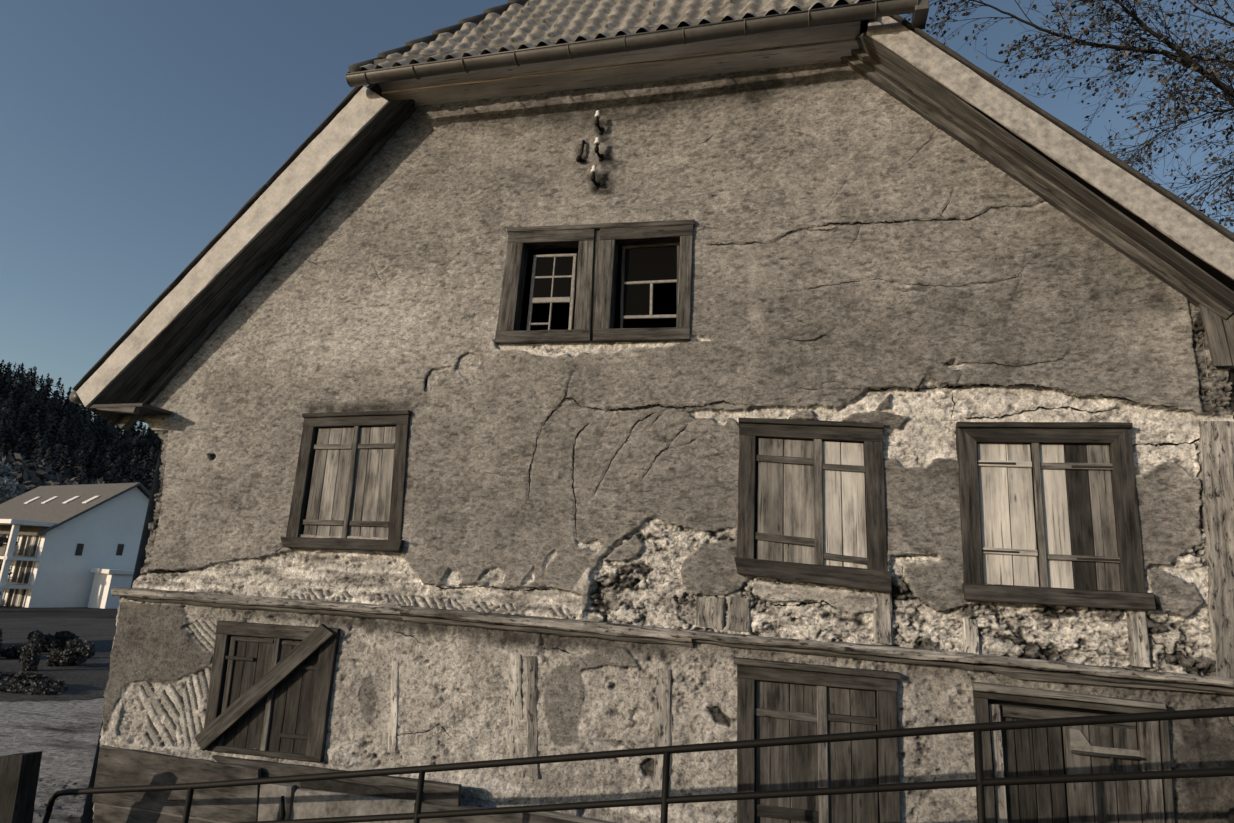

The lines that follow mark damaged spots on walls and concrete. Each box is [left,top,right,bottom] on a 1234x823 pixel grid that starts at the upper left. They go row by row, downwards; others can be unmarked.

crack [708,180,1045,246]
crack [808,259,1026,303]
crack [486,377,745,538]
spalling [122,302,1234,676]